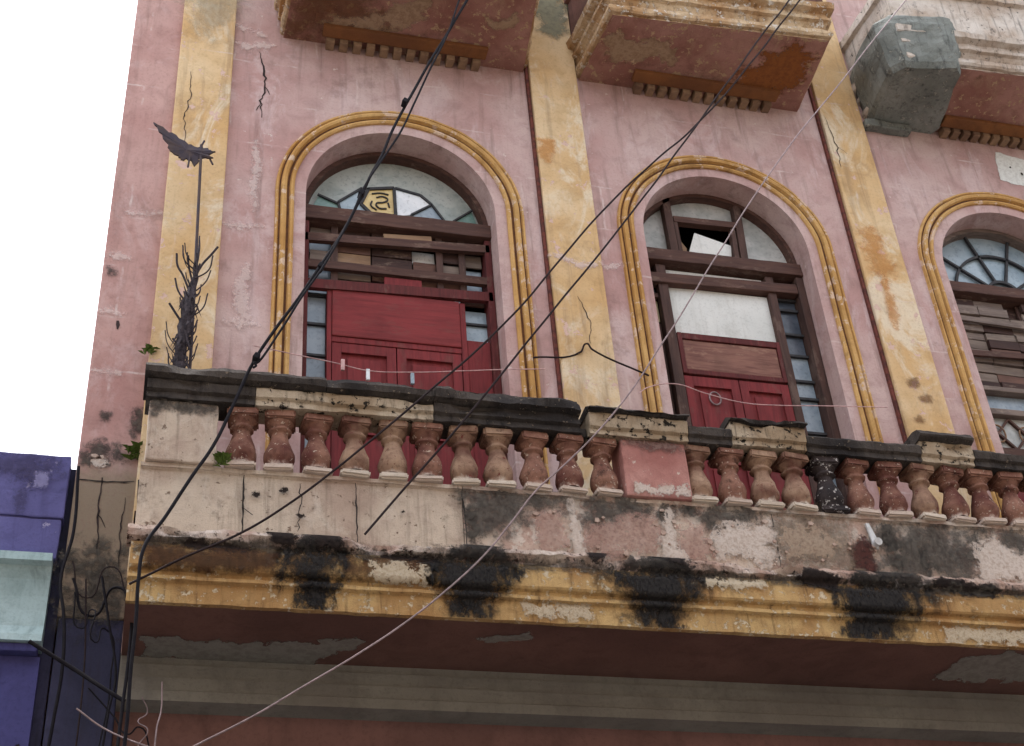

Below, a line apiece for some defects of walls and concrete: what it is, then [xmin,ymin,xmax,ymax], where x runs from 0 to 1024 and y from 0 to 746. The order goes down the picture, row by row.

crack [183,72,192,141]
crack [256,53,270,117]
crack [241,476,253,531]
peeling [368,552,451,588]
damp [48,487,1024,640]
peeling [532,510,878,591]
peeling [932,625,1024,684]